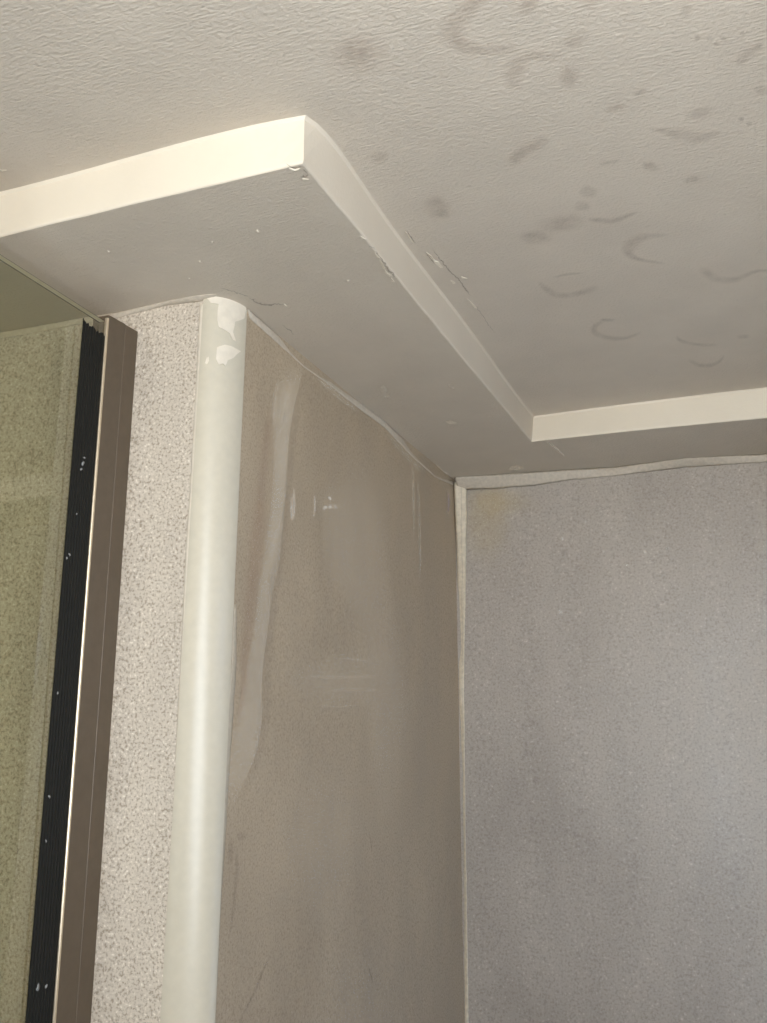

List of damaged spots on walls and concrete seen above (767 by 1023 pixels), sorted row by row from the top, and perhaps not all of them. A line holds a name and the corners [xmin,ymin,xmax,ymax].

peeling [205,296,246,366]